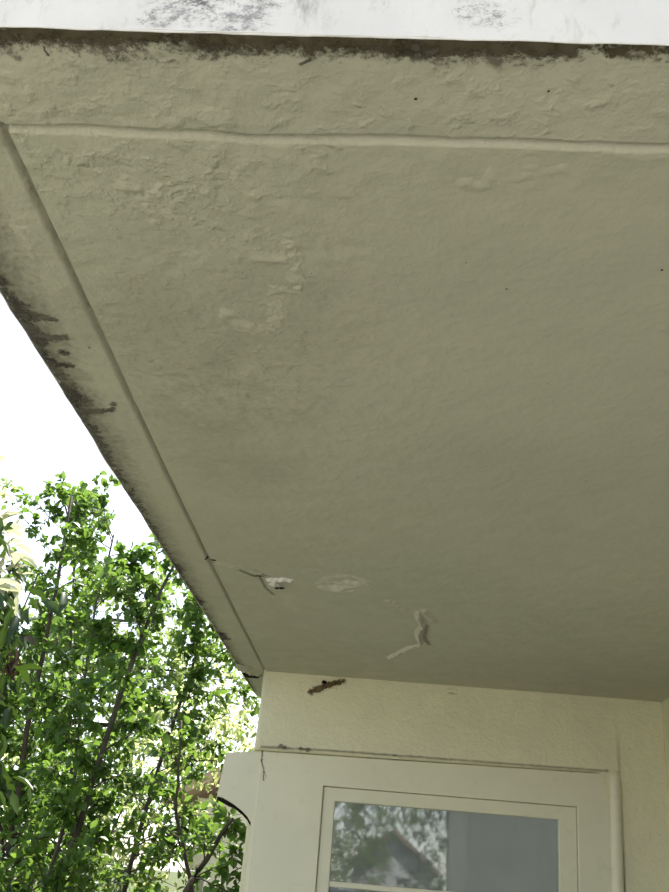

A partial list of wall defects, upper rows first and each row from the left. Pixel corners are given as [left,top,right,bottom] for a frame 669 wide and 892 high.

water stain [1,289,74,368]
water stain [61,384,117,414]
spalling [265,577,294,589]